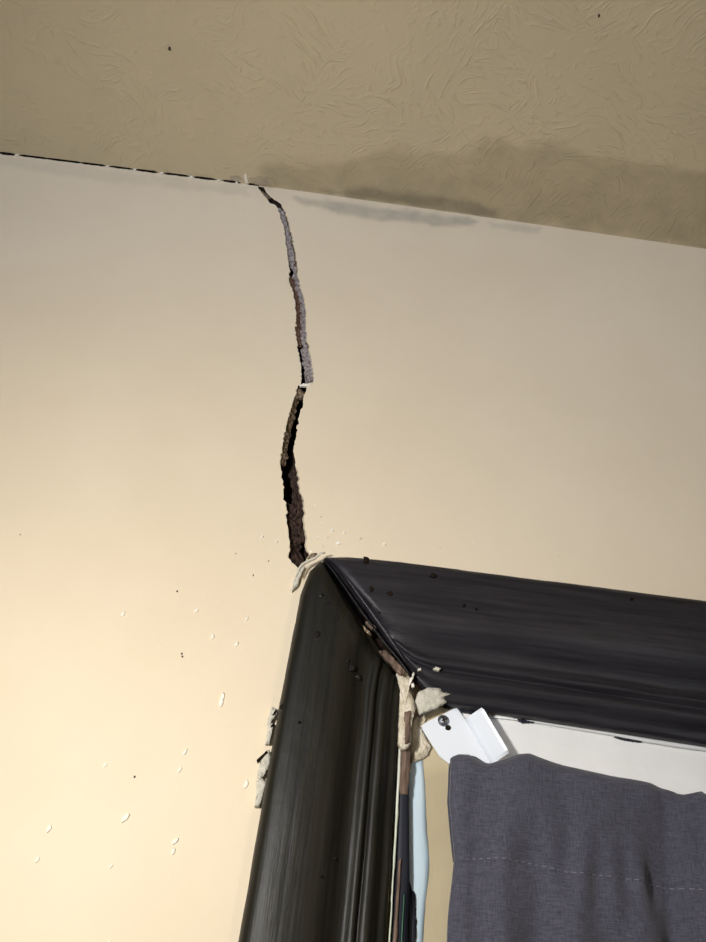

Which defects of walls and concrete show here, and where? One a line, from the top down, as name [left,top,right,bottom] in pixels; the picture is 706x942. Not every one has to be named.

crack [0,152,414,681]